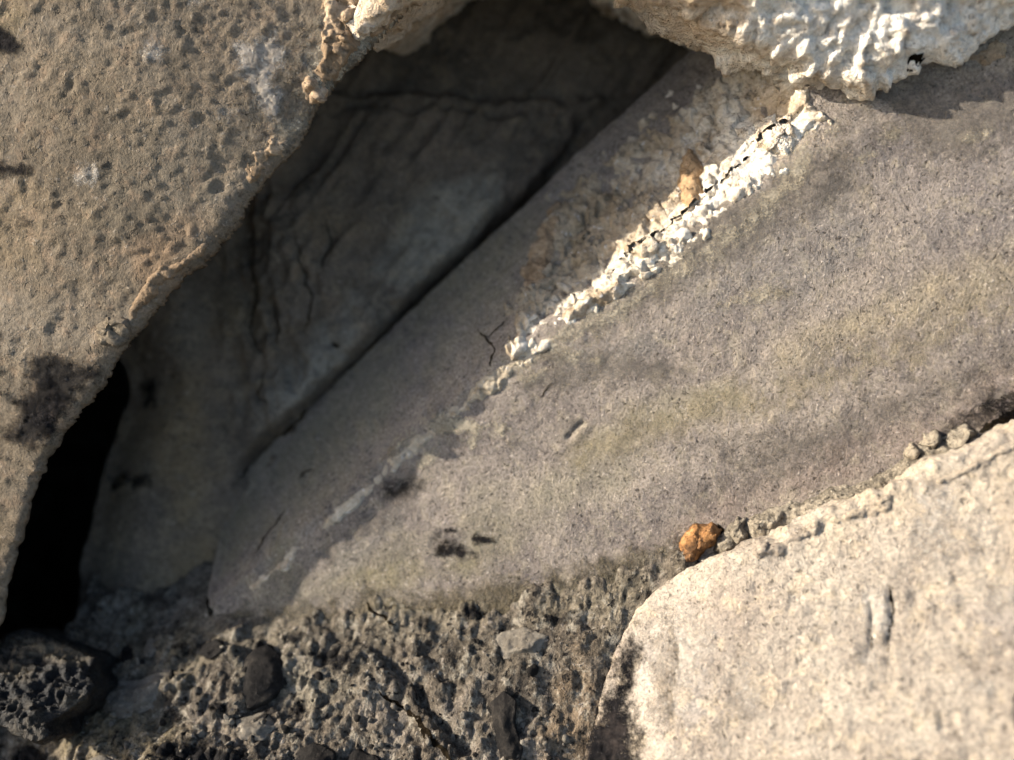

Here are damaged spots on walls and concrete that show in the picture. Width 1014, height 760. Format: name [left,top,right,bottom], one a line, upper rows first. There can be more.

damp [0,28,21,54]
spalling [302,0,409,114]
spalling [907,53,926,73]
damp [0,161,32,176]
spalling [245,136,288,184]
spalling [94,236,217,348]
spalling [323,69,839,531]
damp [2,354,99,449]
crack [979,410,1014,433]
spalling [914,442,1014,494]
spalling [751,494,894,560]
spalling [249,545,305,591]